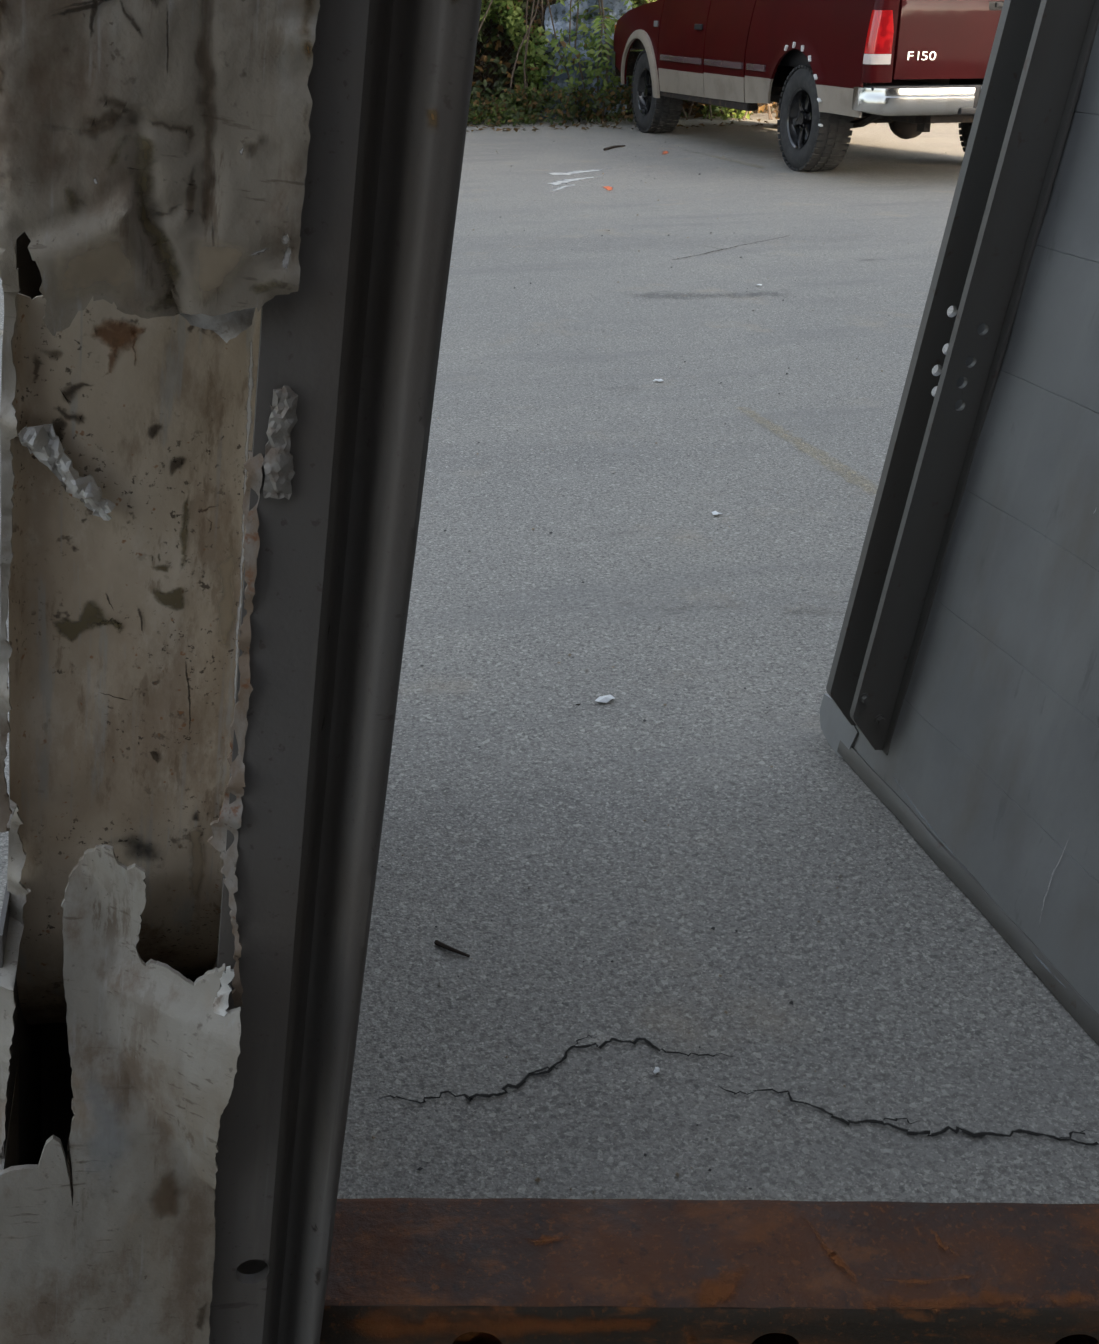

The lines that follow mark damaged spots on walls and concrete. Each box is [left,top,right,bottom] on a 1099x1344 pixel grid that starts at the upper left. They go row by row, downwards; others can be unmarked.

damp [61,0,141,34]
corrosion [94,320,145,374]
peeling [18,424,115,521]
peeling [262,385,298,500]
peeling [213,966,234,1016]
crack [382,1035,1099,1146]